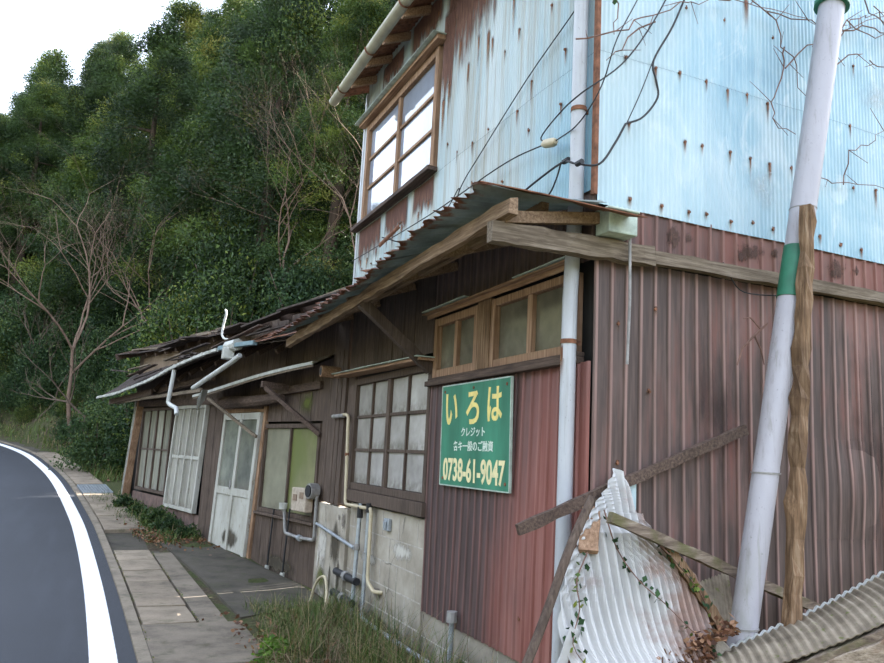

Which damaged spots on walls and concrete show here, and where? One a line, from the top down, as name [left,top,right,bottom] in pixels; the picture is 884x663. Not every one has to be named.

rust [383,0,496,126]
rust [358,176,434,270]
water stain [222,529,236,547]